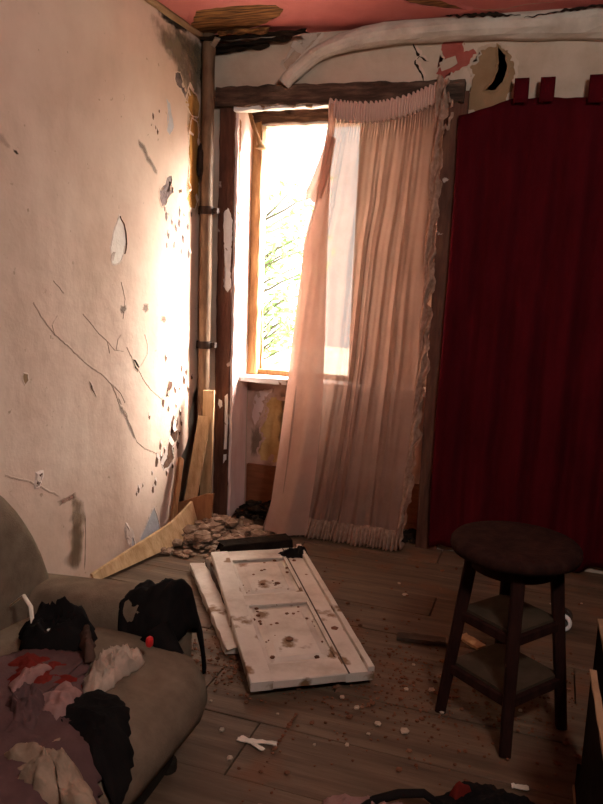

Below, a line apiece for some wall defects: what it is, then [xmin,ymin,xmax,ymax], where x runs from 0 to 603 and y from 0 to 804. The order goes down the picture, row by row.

damp [161,13,202,96]
spalling [185,1,289,48]
crack [413,44,429,81]
spalling [401,0,473,10]
flaking render [434,41,519,113]
spalling [158,70,201,259]
flaking render [110,214,127,266]
crack [33,302,162,454]
spalling [136,362,193,496]
damp [61,494,86,566]
peeling [124,505,161,548]